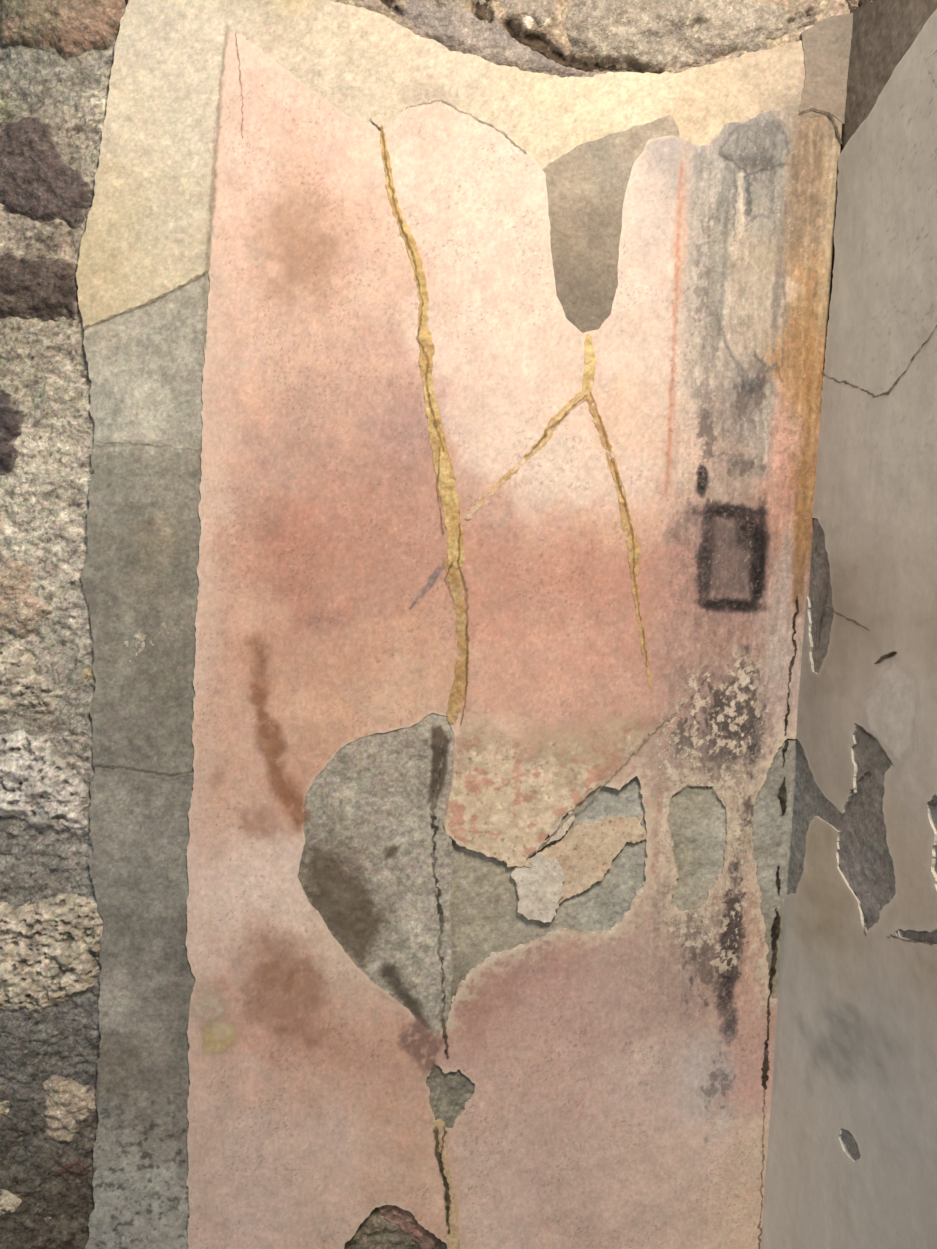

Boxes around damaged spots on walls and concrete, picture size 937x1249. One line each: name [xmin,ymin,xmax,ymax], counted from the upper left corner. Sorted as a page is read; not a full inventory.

crack [406,100,527,154]
peeling [542,115,680,333]
crack [821,325,937,398]
crack [370,118,652,1059]
crack [778,596,799,815]
crack [874,651,897,664]
spalling [298,645,916,1035]
spalling [927,796,937,873]
spalling [890,929,937,945]
crack [758,865,781,1249]
spalling [344,1205,447,1249]
crack [432,1119,460,1249]